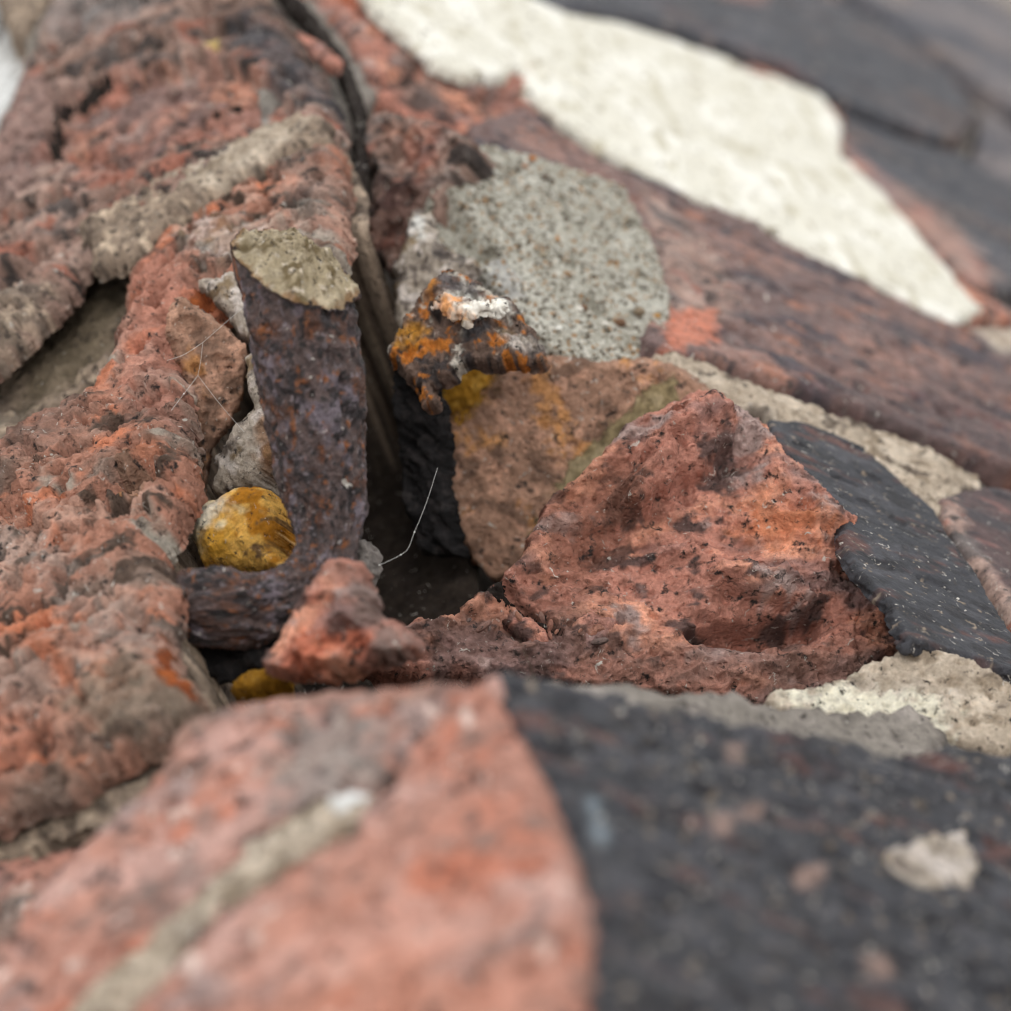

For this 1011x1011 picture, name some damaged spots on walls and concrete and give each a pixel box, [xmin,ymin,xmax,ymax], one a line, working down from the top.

rust [387,269,551,559]